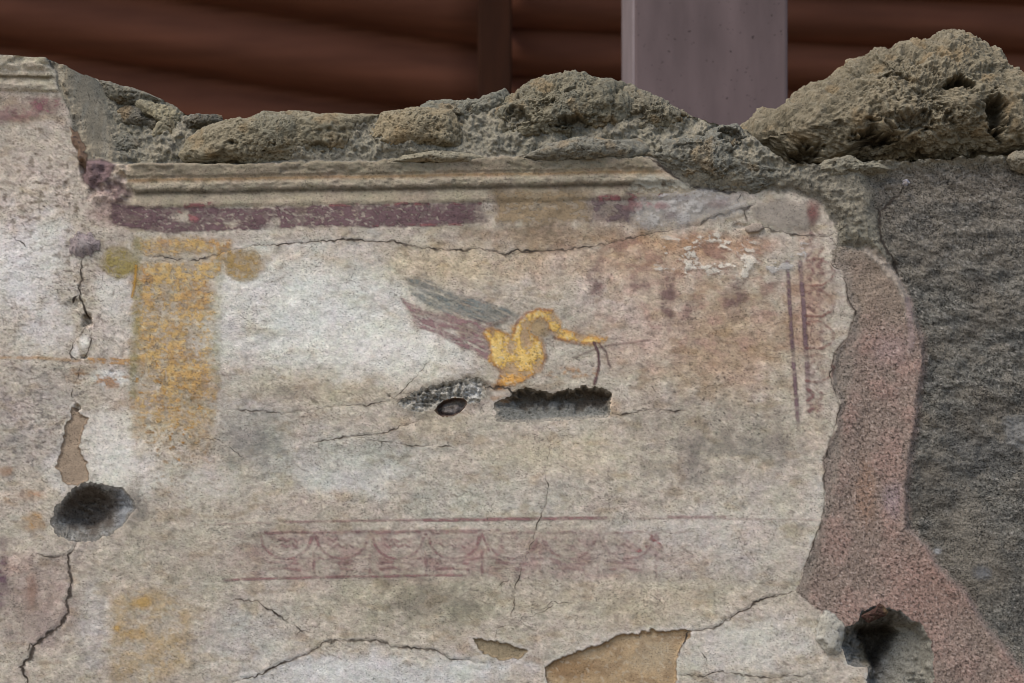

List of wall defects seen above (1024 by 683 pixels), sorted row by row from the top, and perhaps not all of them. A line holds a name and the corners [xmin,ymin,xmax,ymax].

crack [255,231,669,256]
crack [69,261,92,397]
spalling [397,377,487,412]
spalling [55,407,89,486]
crack [19,549,74,683]
crack [233,599,469,681]
spalling [474,639,527,660]
spalling [545,629,691,683]